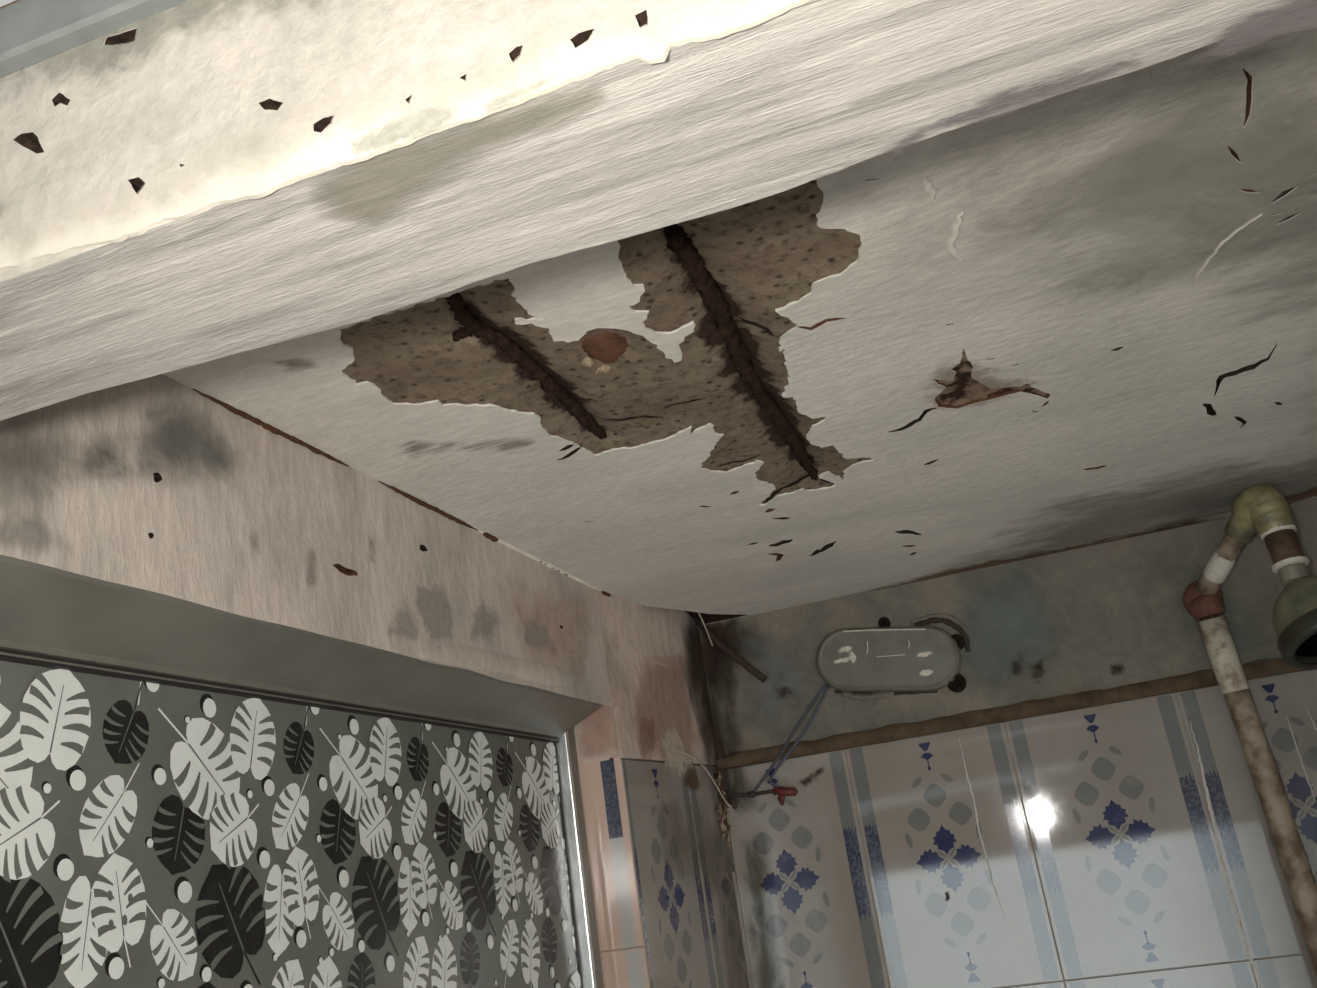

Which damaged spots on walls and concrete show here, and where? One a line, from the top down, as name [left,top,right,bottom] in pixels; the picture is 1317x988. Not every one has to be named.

peeling [0,0,812,271]
crack [1191,68,1300,290]
spalling [339,179,874,520]
crack [798,318,845,330]
spalling [889,349,1050,432]
crack [1202,344,1277,428]
damp [0,437,49,491]
damp [148,416,228,468]
damp [0,519,49,548]
peeling [748,539,793,561]
peeling [895,530,922,555]
damp [684,618,808,817]